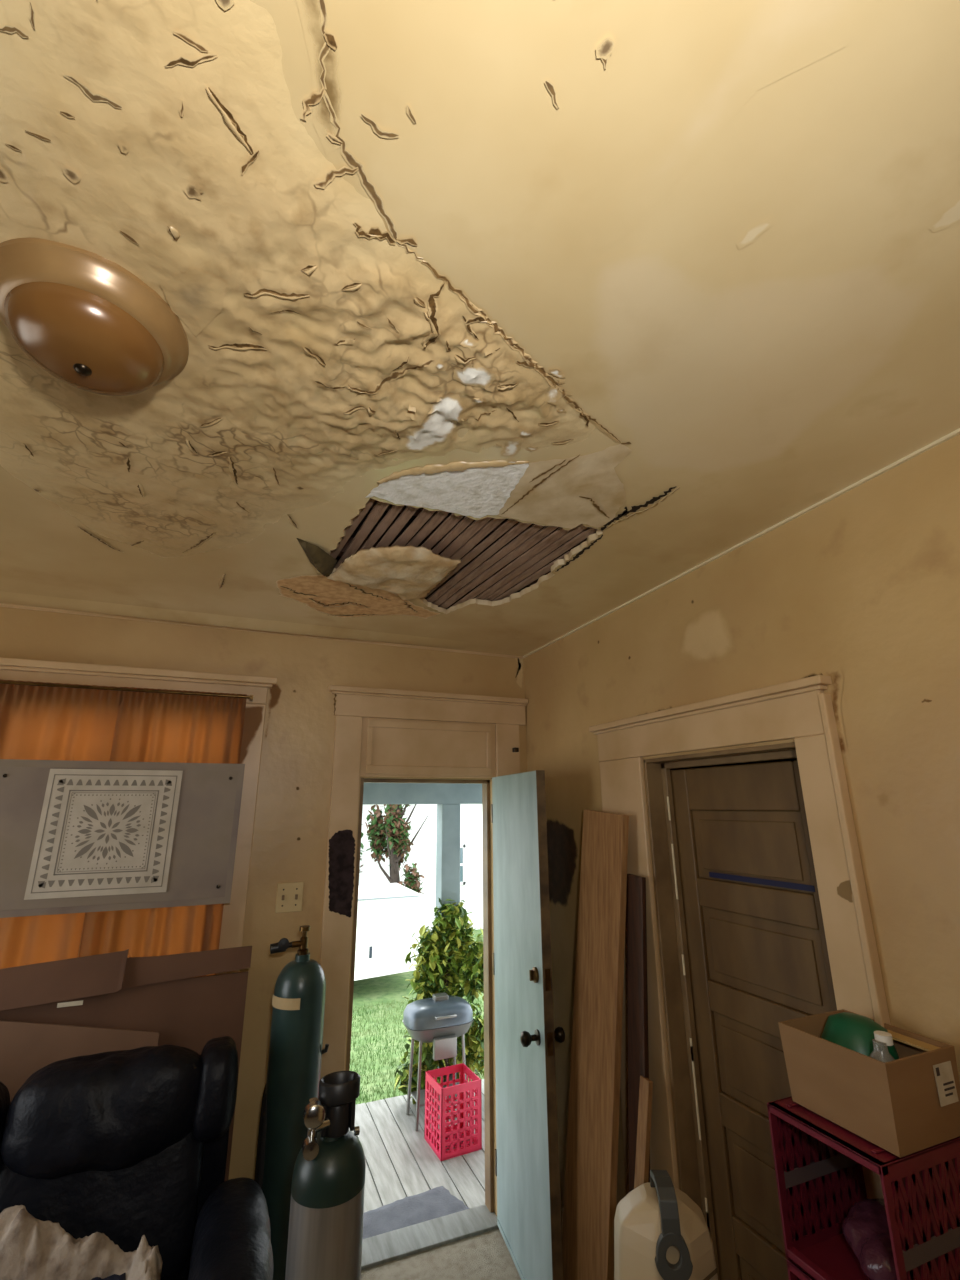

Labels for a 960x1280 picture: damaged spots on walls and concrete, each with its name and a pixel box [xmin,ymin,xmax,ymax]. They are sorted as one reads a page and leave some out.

peeling [167,226,180,240]
crack [300,0,631,445]
peeling [301,264,318,276]
peeling [341,282,362,292]
peeling [244,288,310,315]
peeling [208,327,268,351]
peeling [274,296,632,619]
crack [555,486,680,572]